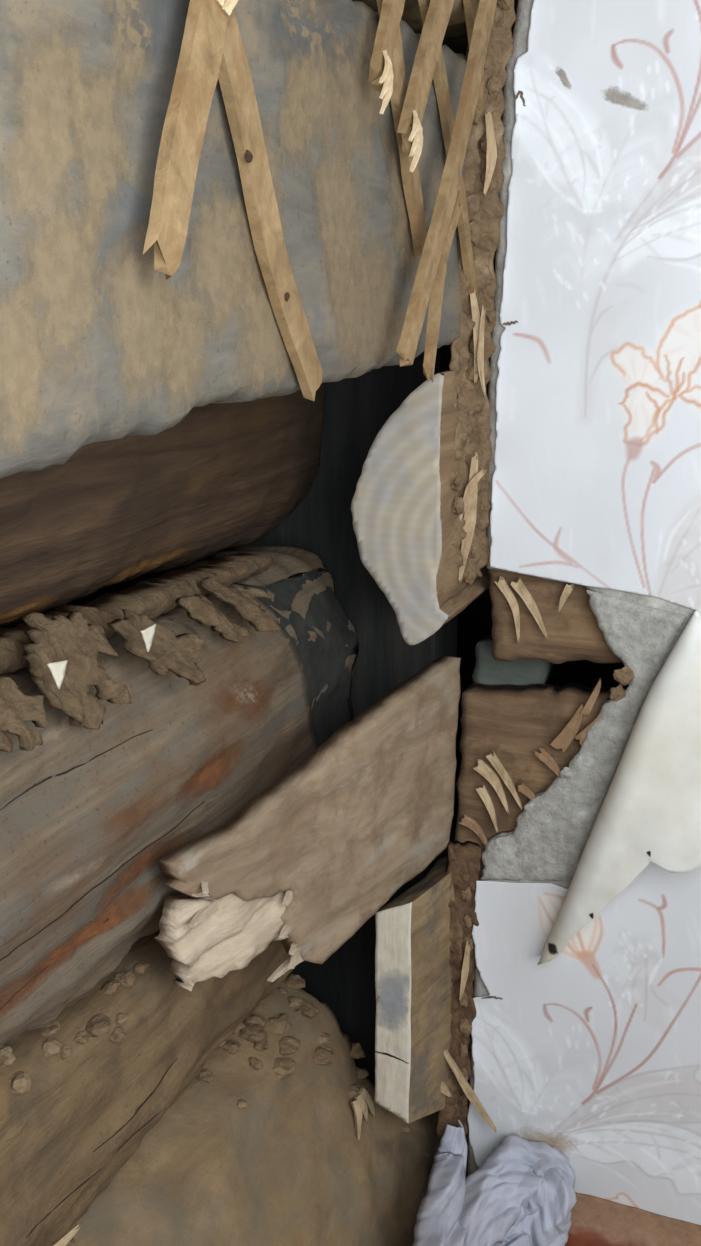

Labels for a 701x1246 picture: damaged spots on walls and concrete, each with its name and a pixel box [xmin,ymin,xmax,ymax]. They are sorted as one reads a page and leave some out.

peeling [556,69,570,87]
peeling [606,89,645,110]
crack [0,729,153,810]
crack [0,802,203,961]
spalling [435,590,687,1148]